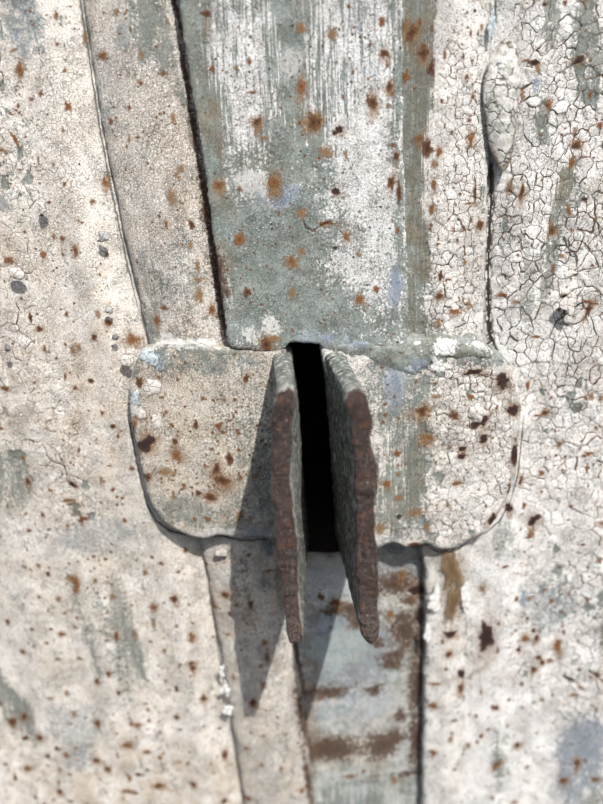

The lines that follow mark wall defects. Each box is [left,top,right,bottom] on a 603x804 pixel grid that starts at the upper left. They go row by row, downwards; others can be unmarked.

crack [0,52,103,551]
rust [383,382,517,501]
crack [412,0,603,736]
rust [0,670,194,804]
rust [448,584,603,784]